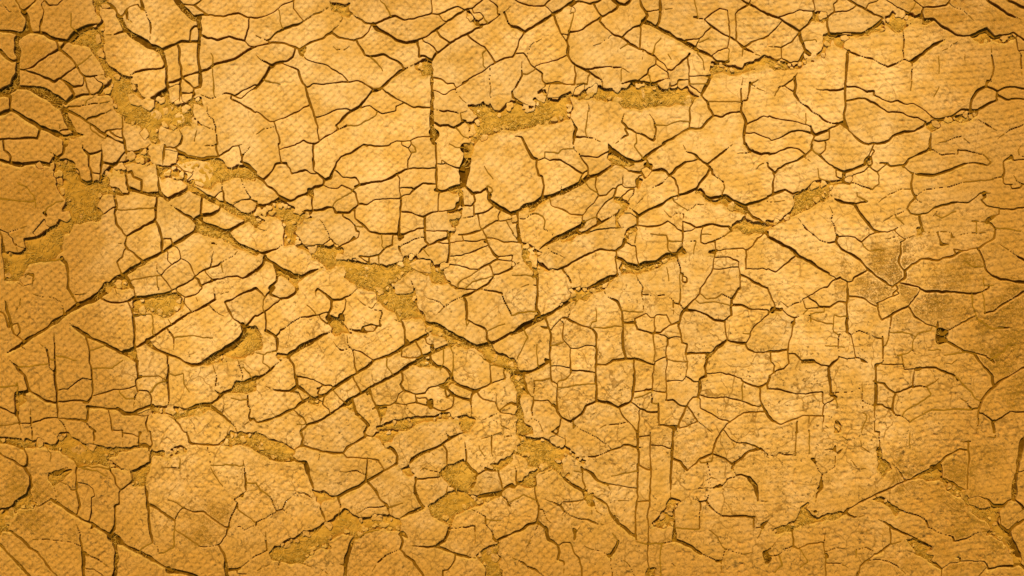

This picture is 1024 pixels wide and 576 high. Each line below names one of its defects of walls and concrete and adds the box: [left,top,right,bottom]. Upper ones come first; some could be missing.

crack [0,0,150,184]
spalling [461,80,698,158]
crack [825,0,884,36]
crack [886,0,1024,74]
crack [0,416,312,576]
crack [0,163,356,462]
spalling [0,0,586,534]
crack [231,319,523,518]
crack [464,442,583,576]
crack [769,307,855,392]
crack [867,292,1024,456]
crack [908,436,1024,576]